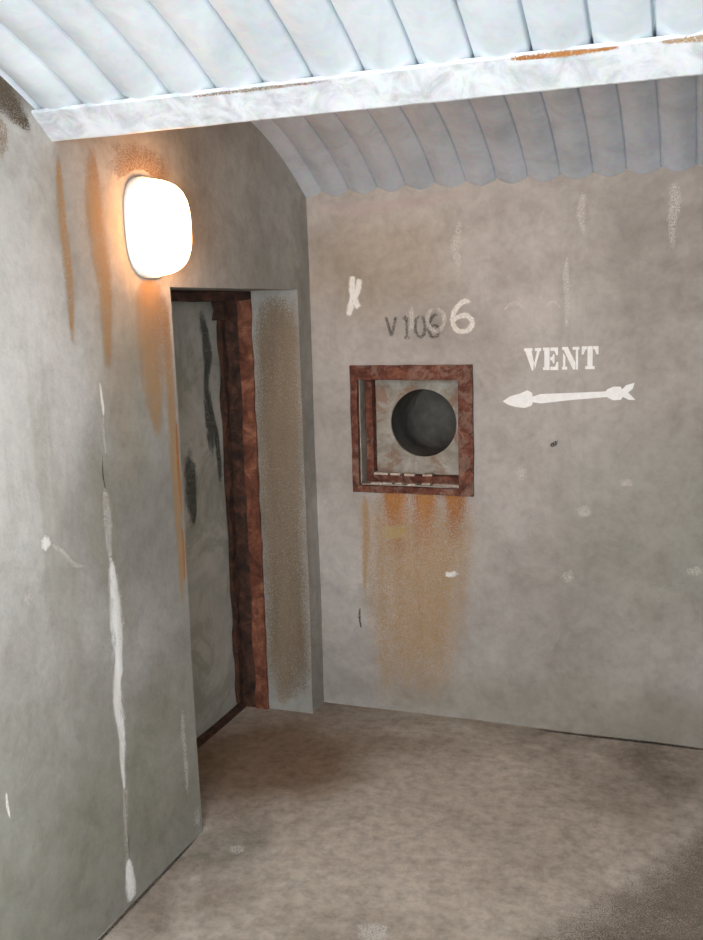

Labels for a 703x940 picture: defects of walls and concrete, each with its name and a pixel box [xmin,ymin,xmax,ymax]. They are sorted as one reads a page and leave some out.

rust [193,81,331,97]
rust [510,46,619,61]
rust [659,35,703,44]
rust [55,157,75,346]
rust [82,139,172,368]
rust [132,278,186,610]
water stain [103,489,137,902]
rust [350,471,481,714]